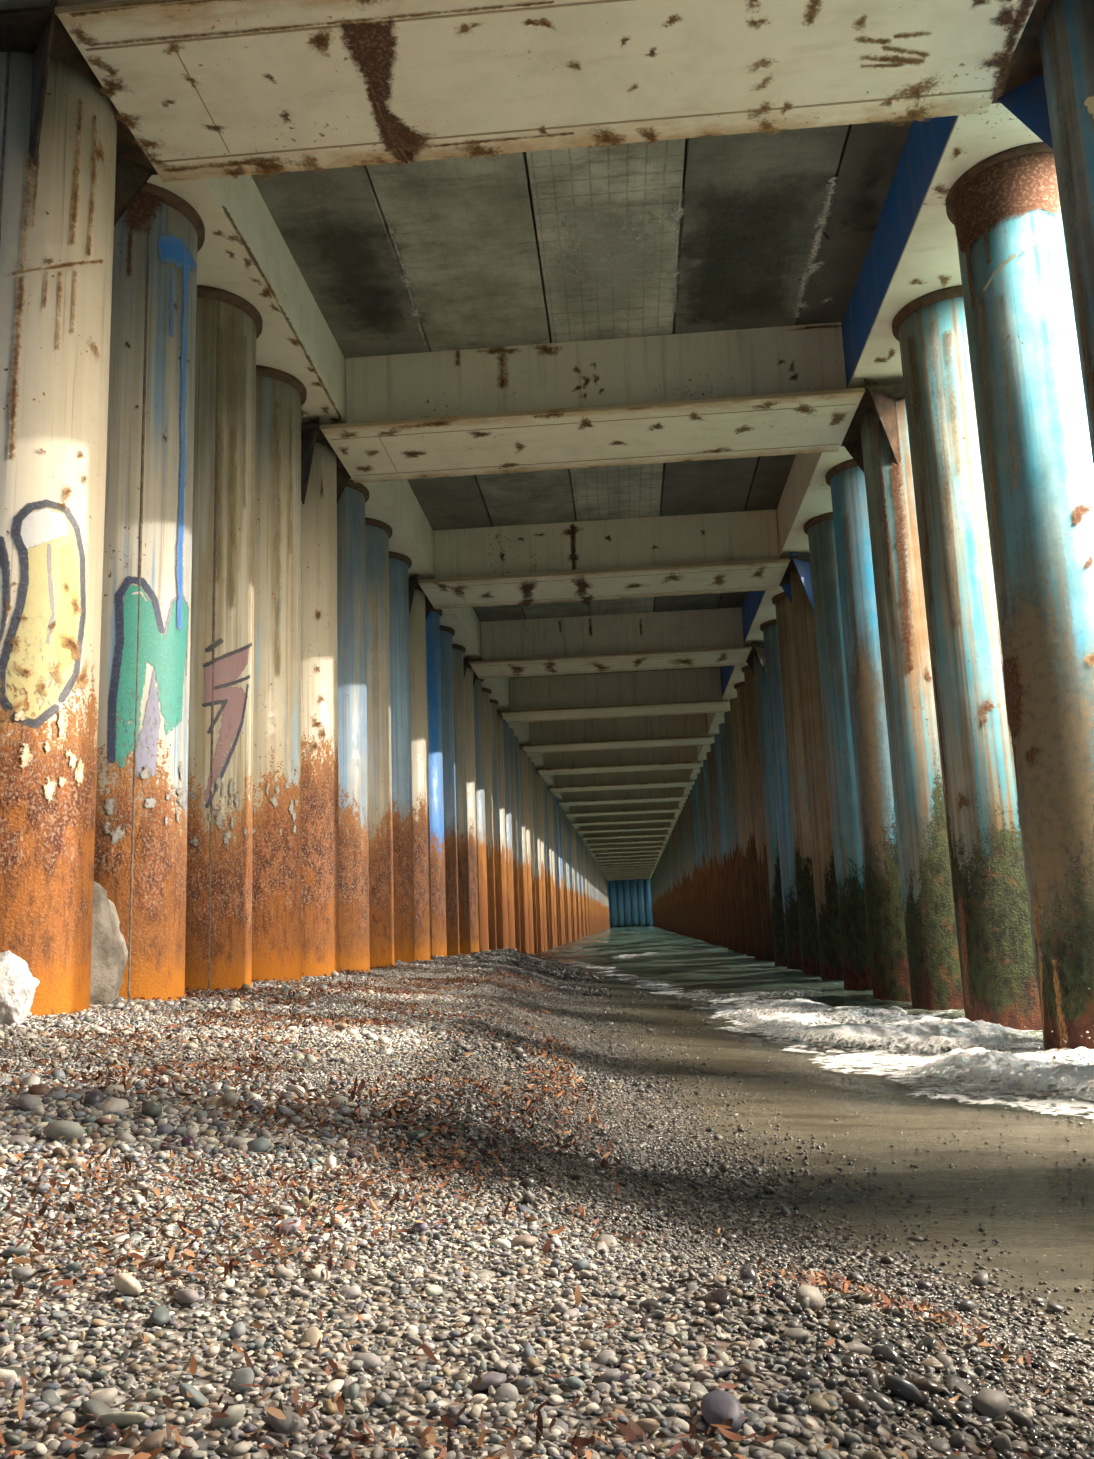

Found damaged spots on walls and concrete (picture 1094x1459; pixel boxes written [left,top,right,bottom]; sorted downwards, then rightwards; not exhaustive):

rust [8,0,574,472]
water stain [312,215,426,345]
rust [589,126,658,148]
water stain [557,177,838,322]
rust [748,59,792,135]
rust [804,0,822,24]
rust [973,0,1034,99]
rust [935,73,1072,309]
rust [1074,233,1094,421]
rust [1073,502,1092,524]
rust [874,324,971,1009]
rust [0,665,480,1016]